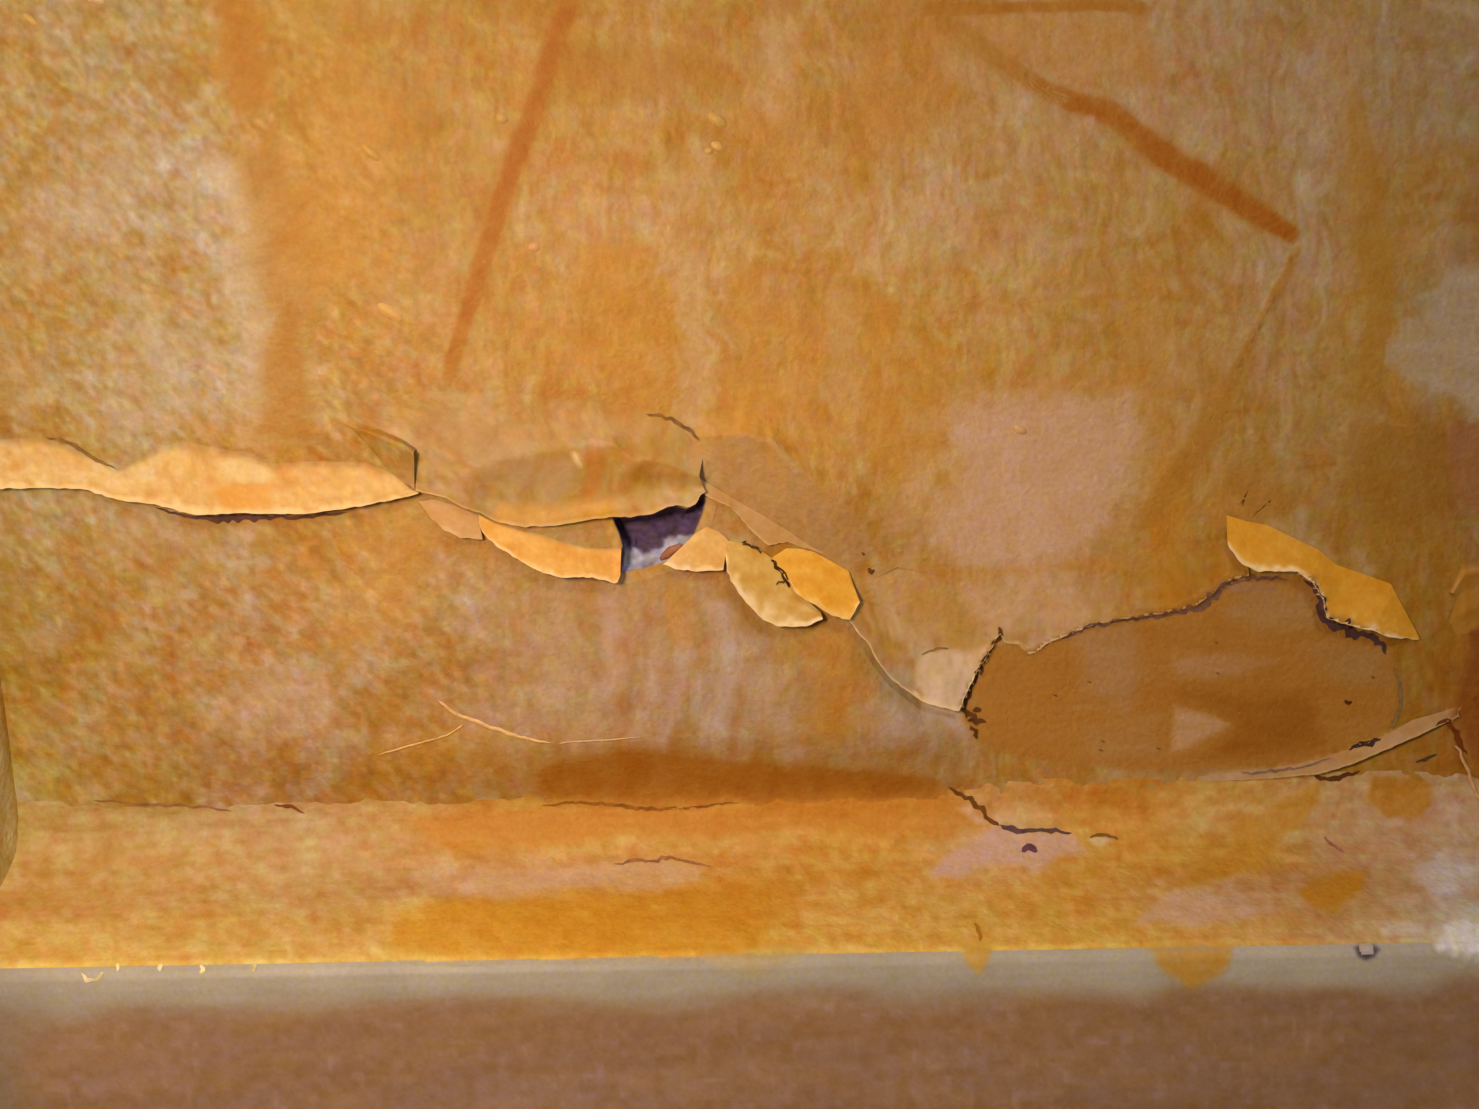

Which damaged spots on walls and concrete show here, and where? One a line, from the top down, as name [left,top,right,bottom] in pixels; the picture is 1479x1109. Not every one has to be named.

peeling [0,391,705,583]
spalling [663,515,1459,782]
leakage [379,870,817,986]
leakage [404,732,992,861]
leakage [953,938,996,979]
crack [948,787,1118,853]
leakage [1154,778,1324,895]
leakage [1296,866,1371,918]
leakage [1362,771,1437,823]
leakage [1374,848,1479,970]